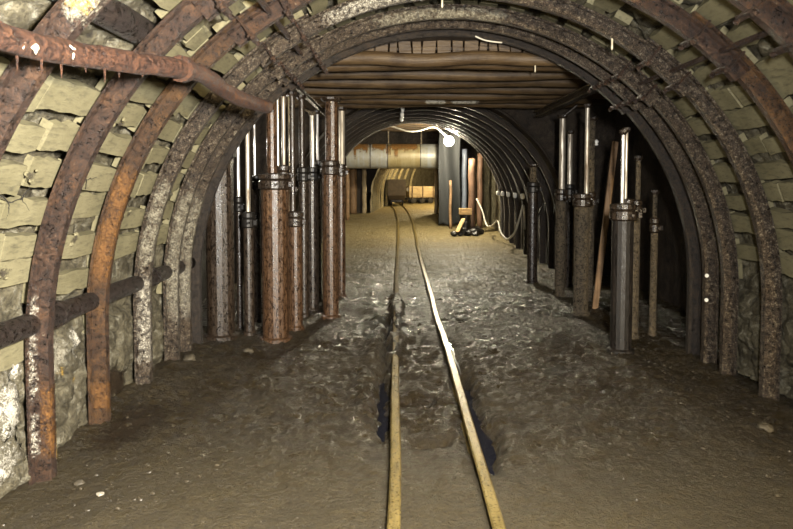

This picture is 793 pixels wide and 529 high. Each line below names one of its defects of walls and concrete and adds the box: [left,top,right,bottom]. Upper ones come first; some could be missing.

rust [92,171,137,282]
rust [40,384,57,455]